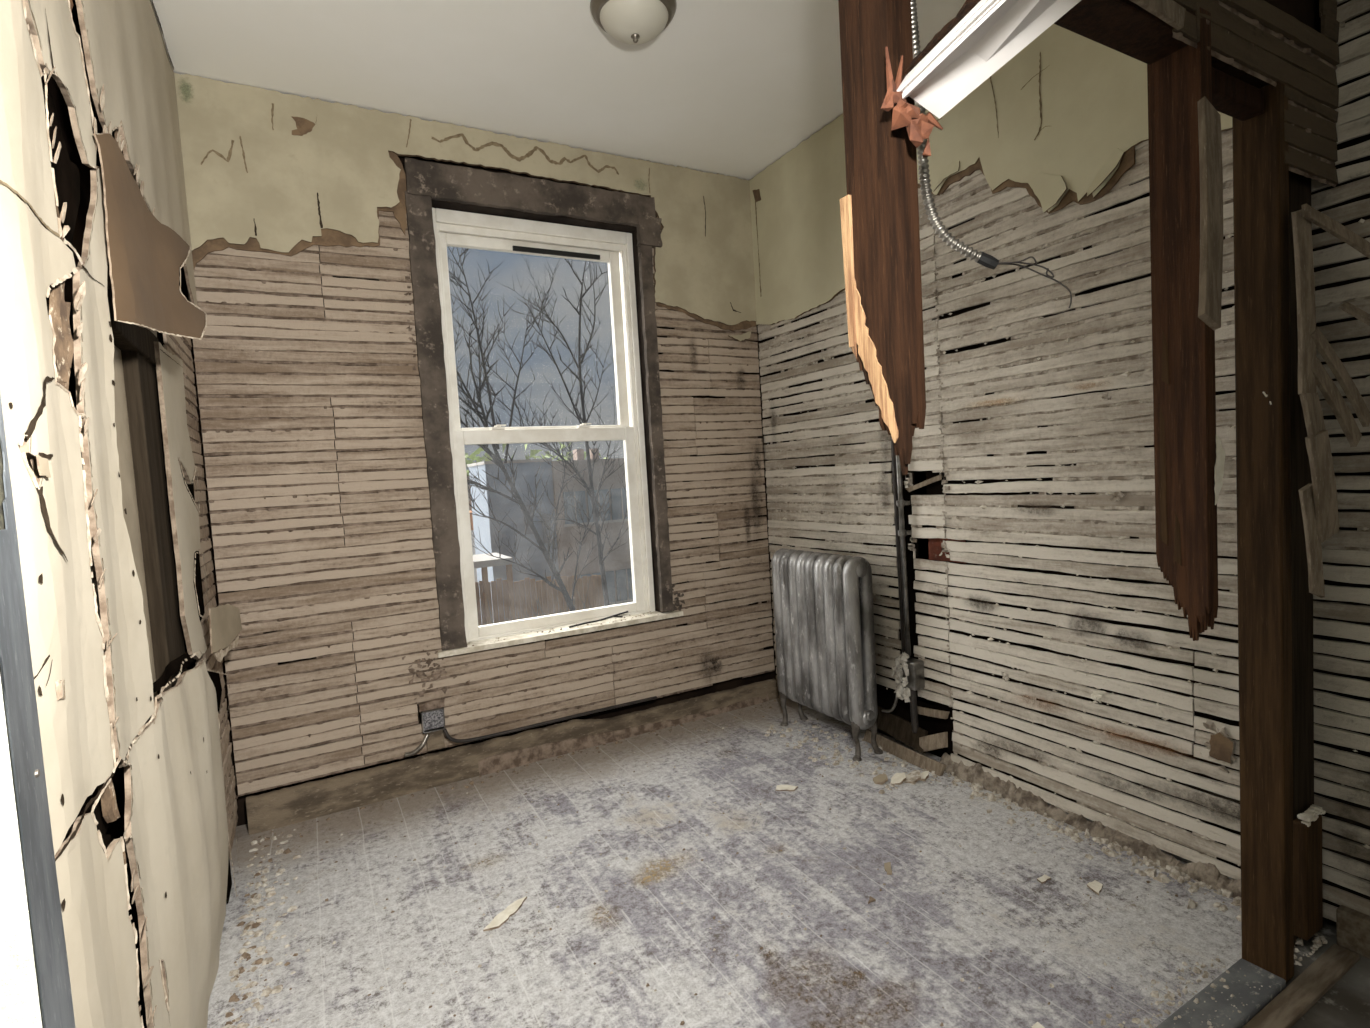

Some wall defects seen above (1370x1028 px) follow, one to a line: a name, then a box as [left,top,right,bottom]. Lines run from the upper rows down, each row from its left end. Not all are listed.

crack [45,9,56,76]
crack [152,0,174,69]
crack [990,52,1047,140]
crack [0,180,60,237]
crack [406,119,650,193]
peeling [934,161,960,191]
peeling [1028,174,1067,213]
peeling [1087,148,1125,197]
crack [25,376,68,562]
crack [34,654,53,686]
crack [55,772,113,862]